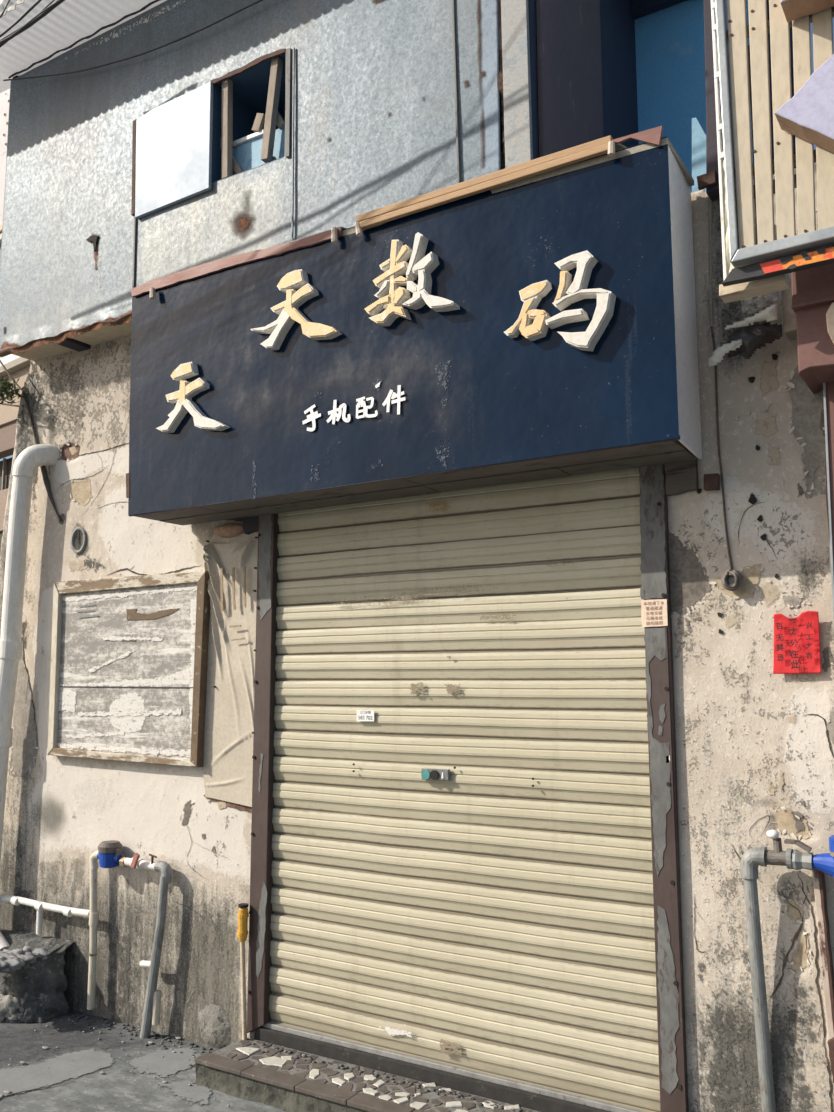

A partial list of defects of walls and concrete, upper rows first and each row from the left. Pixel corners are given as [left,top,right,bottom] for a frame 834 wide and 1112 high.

corrosion [86,235,99,270]
corrosion [233,194,253,237]
flaking render [30,359,91,464]
peeling [639,464,802,876]
flaking render [822,645,834,680]
flaking render [773,800,812,840]
damp [7,823,88,973]
damp [181,895,241,1046]
peeling [657,905,680,1094]
damp [687,950,757,1112]
damp [772,986,826,1112]
crack [769,876,833,1112]